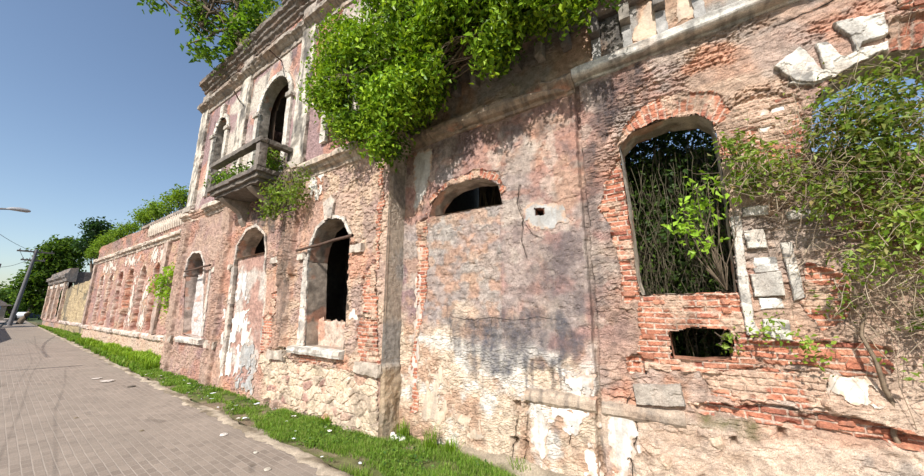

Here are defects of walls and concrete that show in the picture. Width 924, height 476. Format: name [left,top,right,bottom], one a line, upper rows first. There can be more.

spalling [886,0,924,54]
spalling [219,269,379,438]
flaking render [308,173,325,205]
spalling [348,168,386,364]
flaking render [521,392,643,476]
spalling [597,90,924,452]